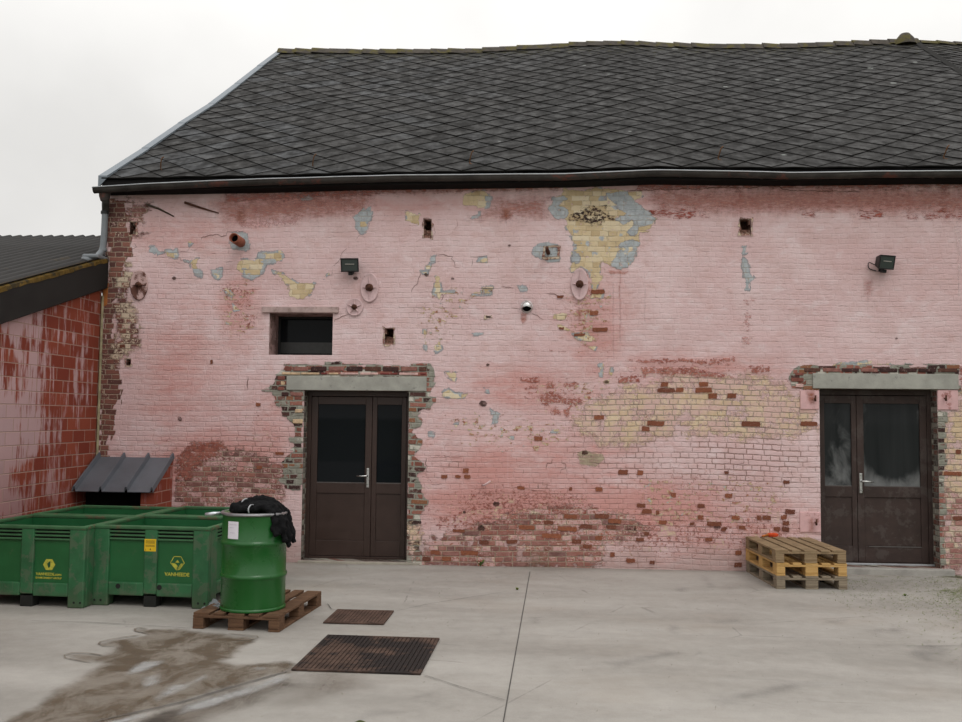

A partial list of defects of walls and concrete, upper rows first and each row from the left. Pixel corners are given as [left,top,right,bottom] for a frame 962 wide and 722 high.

flaking render [99,197,154,457]
peeling [147,232,316,333]
peeling [405,210,434,240]
peeling [419,255,494,354]
peeling [463,189,493,219]
peeling [531,187,656,353]
peeling [738,217,755,345]
flaking render [442,357,820,455]
flaking render [939,366,962,570]
flaking render [421,470,795,568]